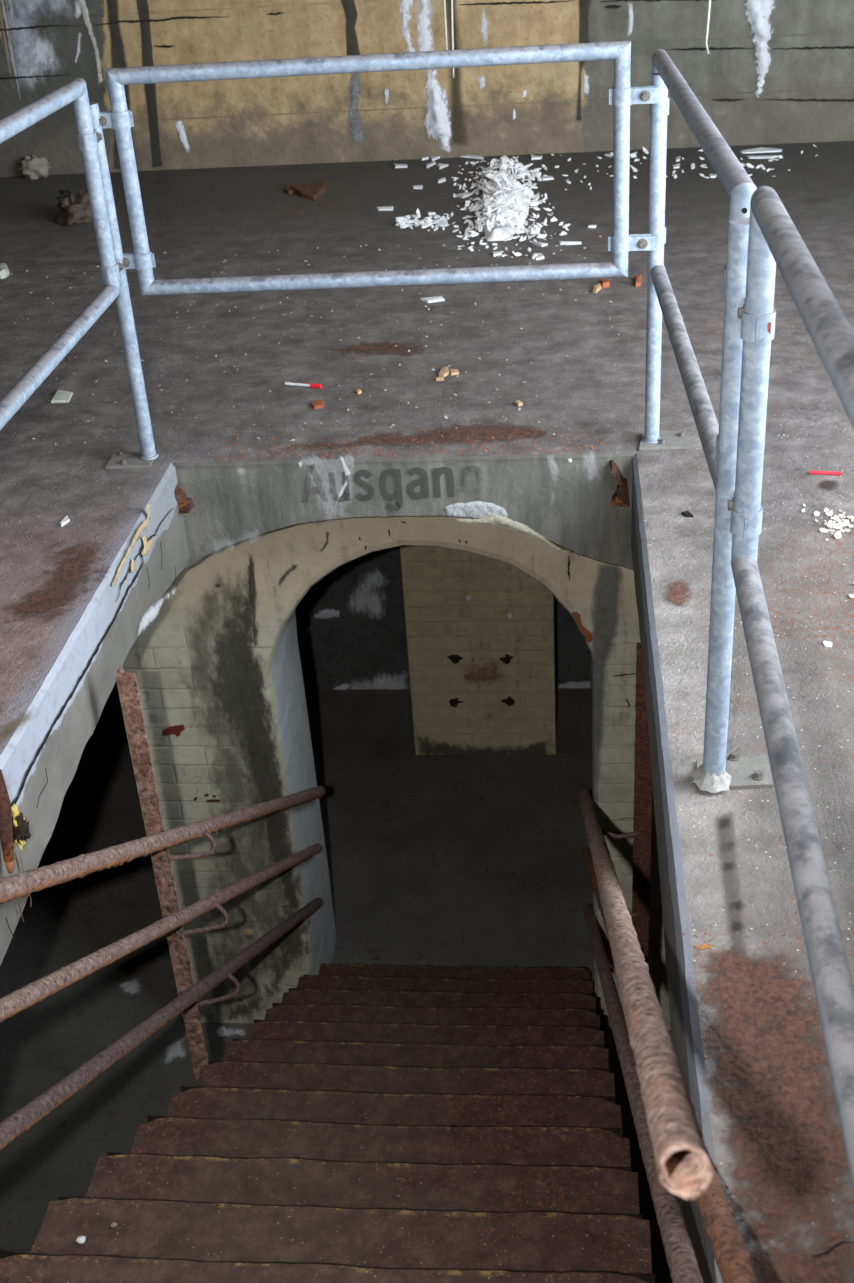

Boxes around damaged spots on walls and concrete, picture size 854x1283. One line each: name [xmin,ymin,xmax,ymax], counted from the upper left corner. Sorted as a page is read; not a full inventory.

leakage [9,0,153,85]
leakage [341,0,360,56]
leakage [399,0,433,52]
leakage [446,0,458,50]
leakage [745,0,774,97]
leakage [124,83,162,167]
leakage [175,121,189,152]
leakage [424,68,464,152]
spalling [445,501,563,551]
corrosion [5,546,102,620]
leakage [193,557,310,1036]
corrosion [698,944,854,1283]